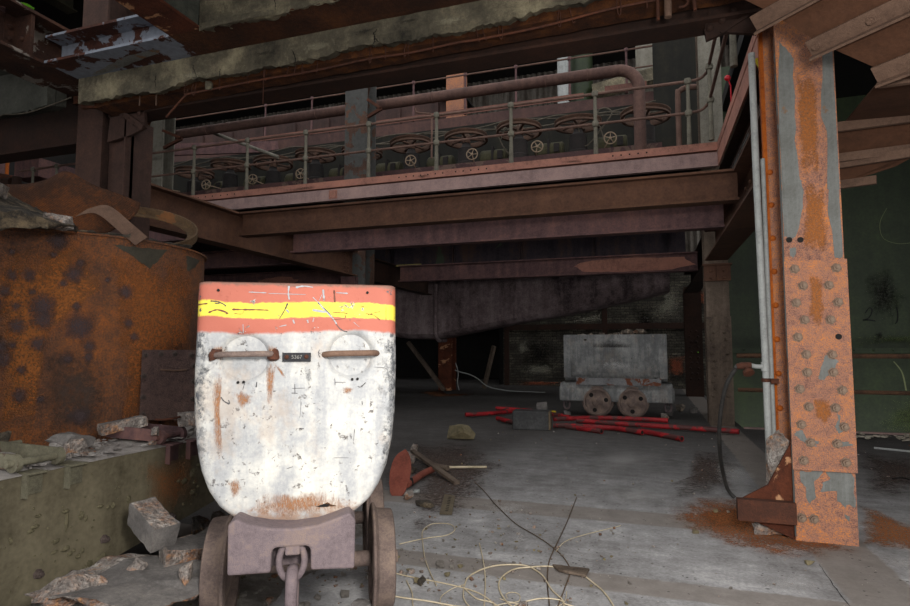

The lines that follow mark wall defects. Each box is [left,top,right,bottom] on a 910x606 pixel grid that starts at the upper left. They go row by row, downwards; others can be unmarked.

rust [798,78,818,170]
rust [804,184,826,248]
rust [809,277,824,325]
rust [679,453,845,556]
peeling [800,471,856,521]
rust [865,509,910,549]